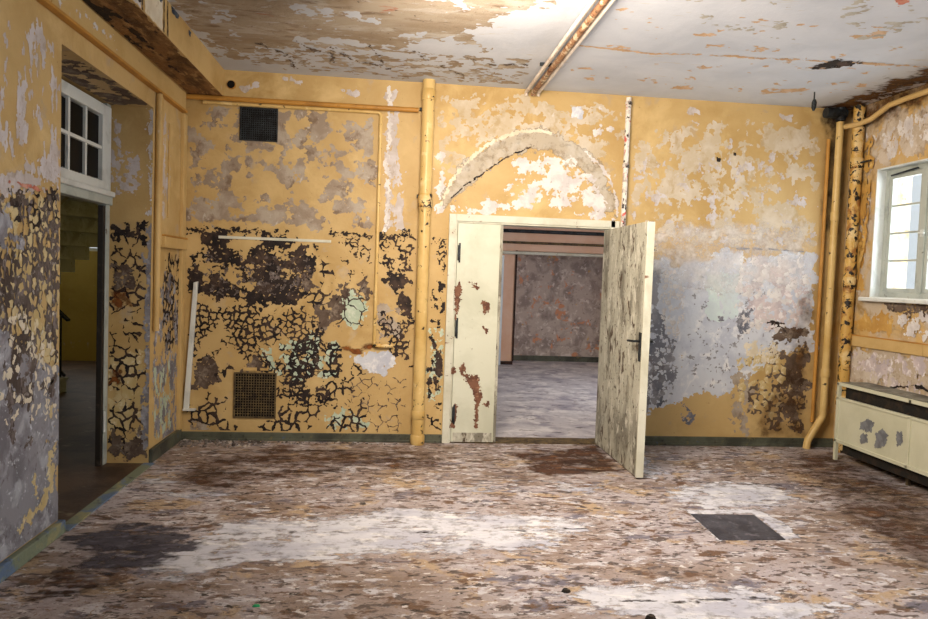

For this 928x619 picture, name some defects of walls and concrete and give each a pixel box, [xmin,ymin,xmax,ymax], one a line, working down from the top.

peeling [0,17,211,562]
peeling [191,354,222,390]
crack [108,41,447,455]
peeling [192,251,415,381]
peeling [76,0,625,241]
peeling [426,281,490,428]
crack [412,51,528,76]
peeling [631,107,821,437]
damp [821,68,928,202]
peeling [840,0,928,40]
peeling [849,347,928,396]
peeling [855,83,928,296]